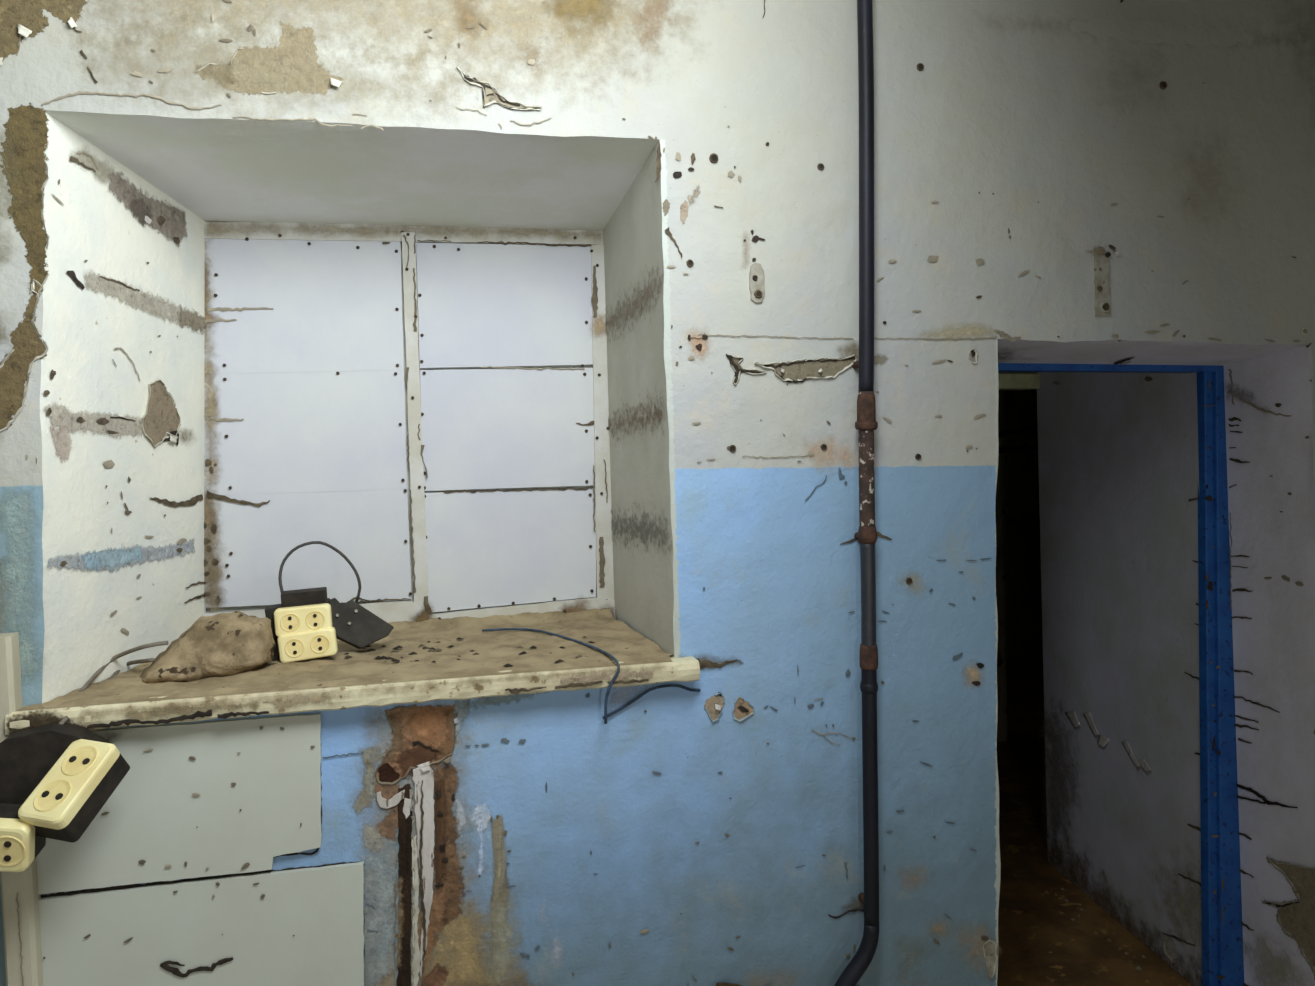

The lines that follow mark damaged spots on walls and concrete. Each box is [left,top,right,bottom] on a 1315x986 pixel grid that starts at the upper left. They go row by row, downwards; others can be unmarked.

peeling [0,0,89,65]
peeling [193,21,345,98]
leakage [167,0,663,59]
peeling [0,102,206,461]
peeling [726,354,857,385]
crack [1227,369,1291,619]
peeling [704,692,777,723]
crack [1233,670,1280,744]
crack [1236,784,1298,808]
peeling [1262,856,1315,979]